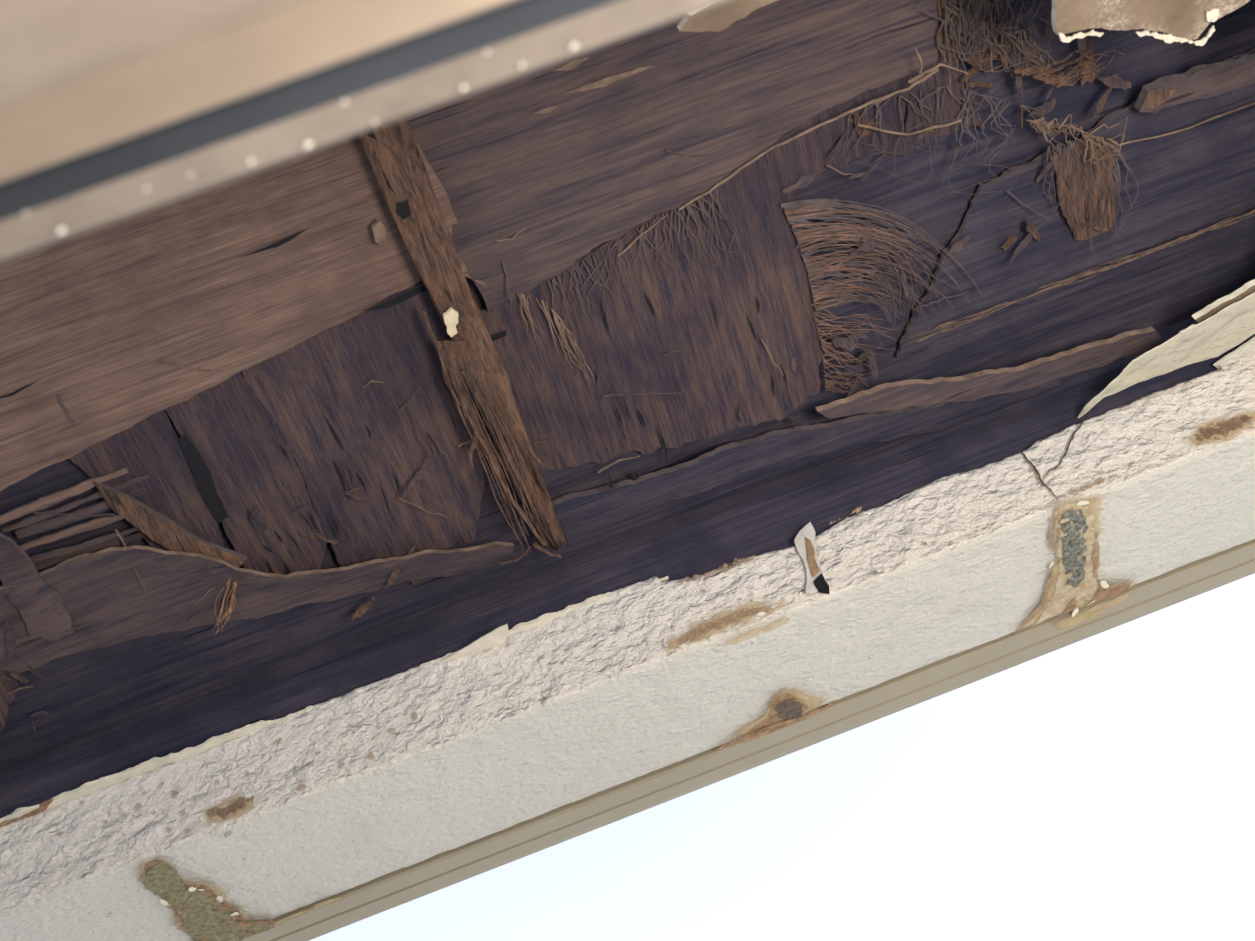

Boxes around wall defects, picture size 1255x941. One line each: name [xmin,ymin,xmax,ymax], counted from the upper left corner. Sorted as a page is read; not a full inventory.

flaking render [1078,292,1255,418]
crack [1016,421,1117,500]
spalling [659,555,755,593]
peeling [794,522,829,594]
peeling [419,592,611,668]
rust [714,690,833,751]
peeling [0,703,327,827]